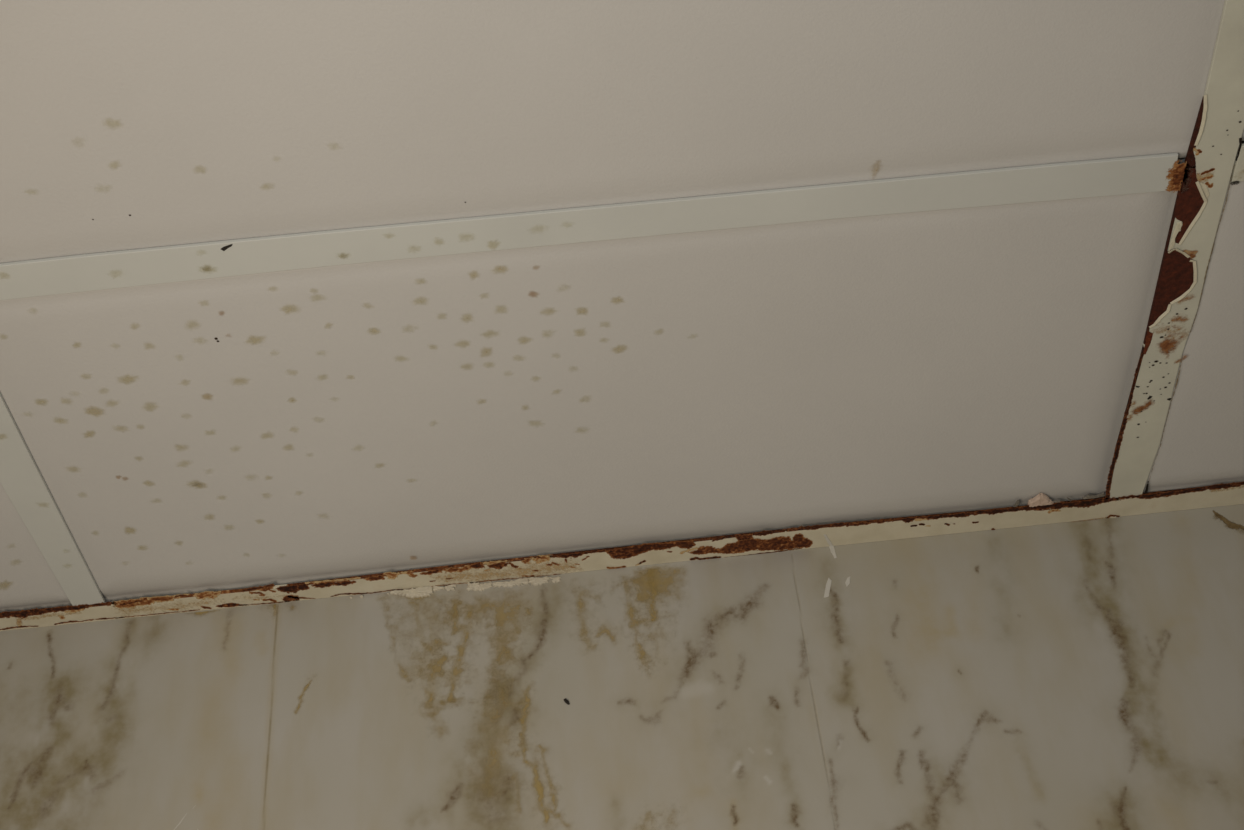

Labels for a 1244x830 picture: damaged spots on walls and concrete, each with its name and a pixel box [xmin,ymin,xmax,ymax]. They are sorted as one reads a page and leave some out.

corrosion [1166,160,1191,193]
peeling [1143,95,1210,354]
corrosion [1159,297,1188,363]
corrosion [0,346,1244,630]
crack [1213,510,1244,530]
water stain [628,569,677,627]